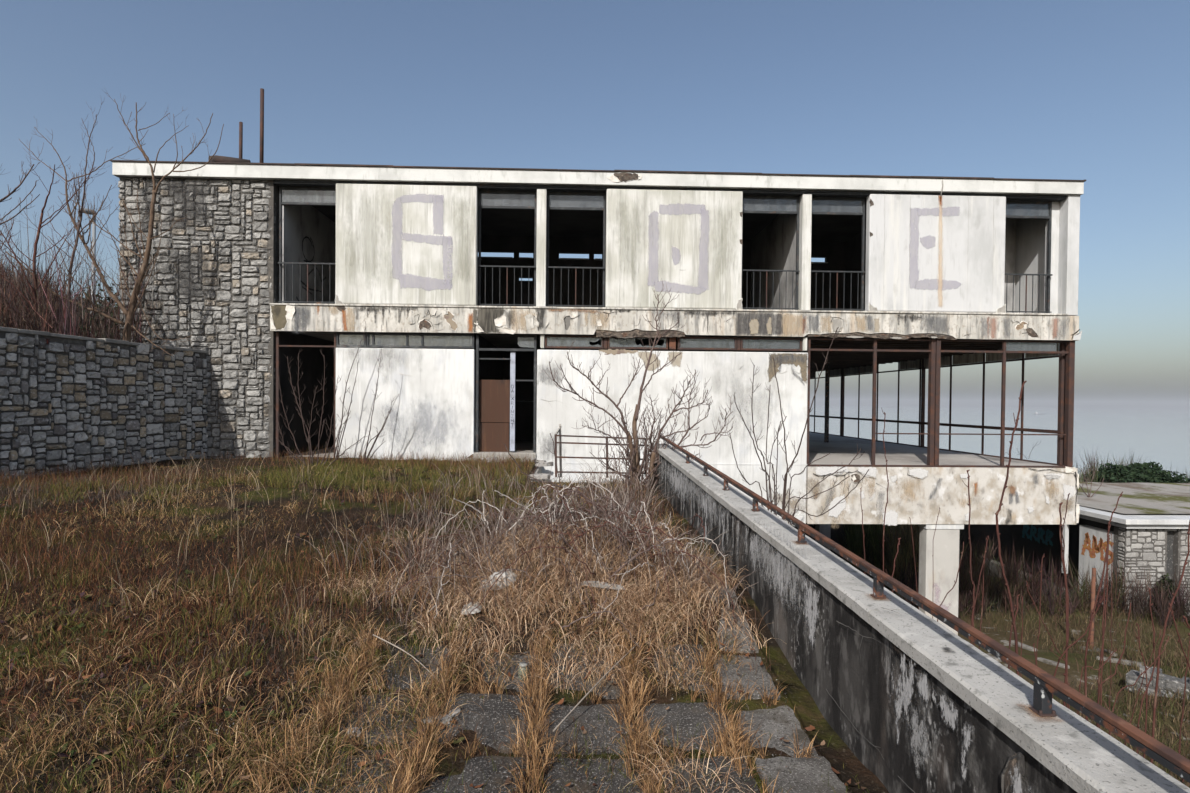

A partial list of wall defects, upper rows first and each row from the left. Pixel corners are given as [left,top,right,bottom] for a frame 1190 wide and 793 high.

peeling [270,305,295,331]
spalling [334,294,354,331]
peeling [408,309,458,332]
peeling [473,308,516,334]
spalling [808,332,957,340]
peeling [996,304,1039,337]
peeling [768,353,808,383]
leakage [657,454,820,647]
leakage [890,654,971,778]
leakage [1010,767,1031,793]